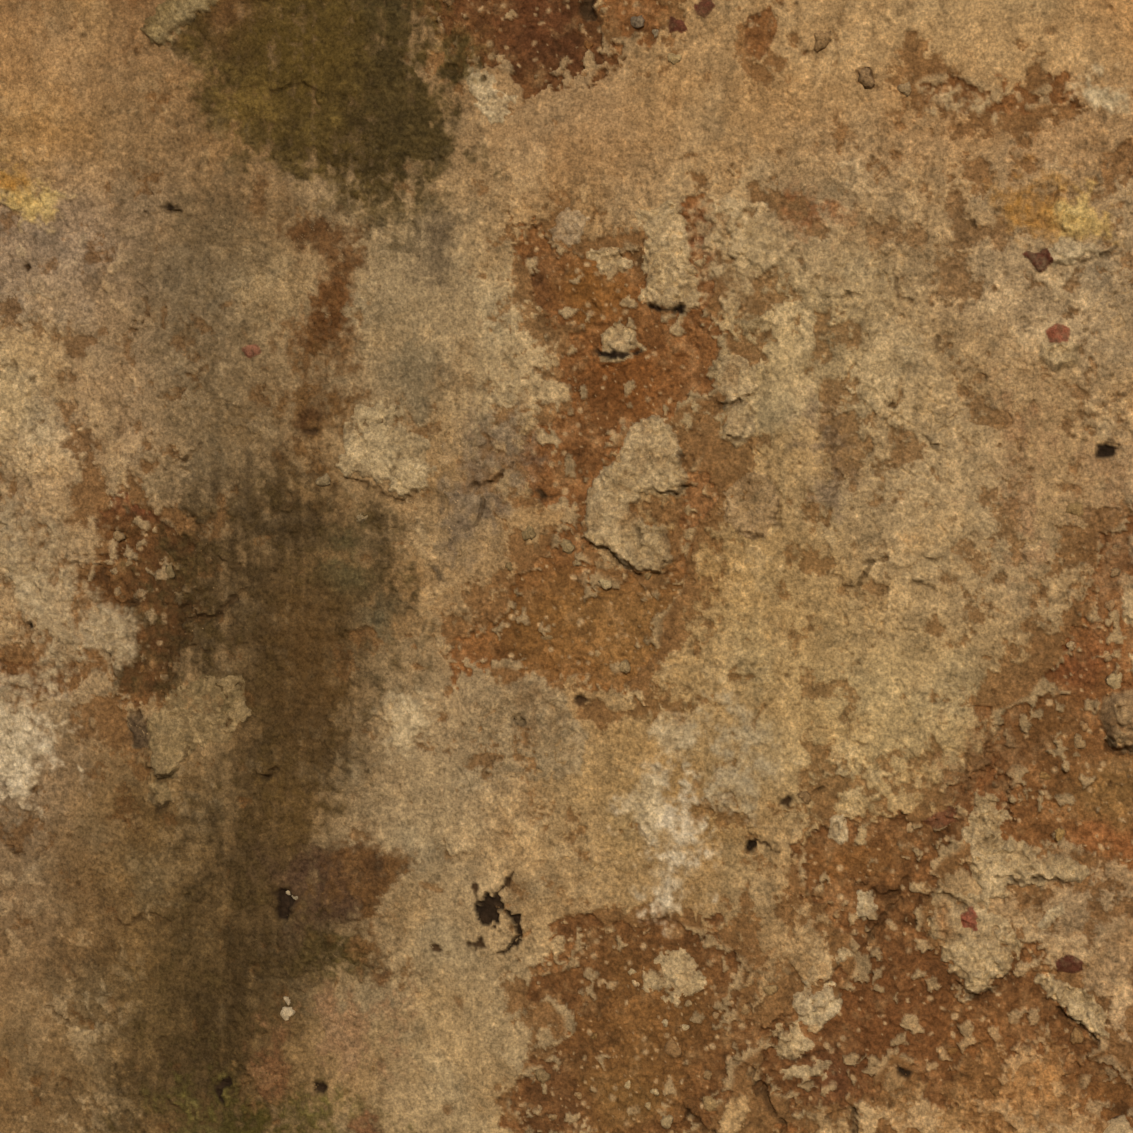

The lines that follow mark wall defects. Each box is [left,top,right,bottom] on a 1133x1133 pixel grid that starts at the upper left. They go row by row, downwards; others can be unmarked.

spalling [443,0,716,125]
water stain [0,90,561,584]
spalling [441,192,781,707]
efflorescence [366,681,442,775]
spalling [496,592,1133,1133]